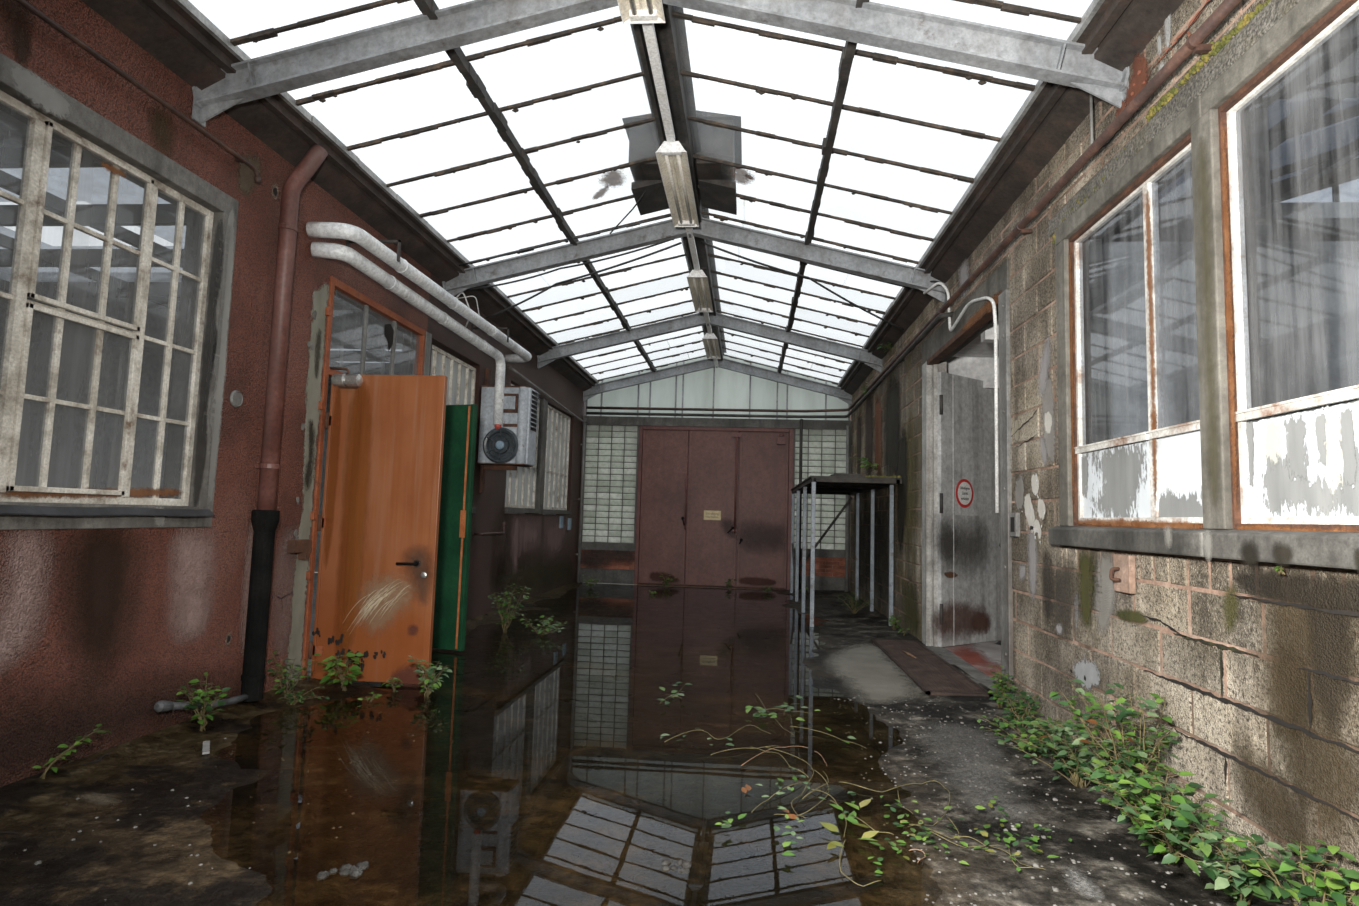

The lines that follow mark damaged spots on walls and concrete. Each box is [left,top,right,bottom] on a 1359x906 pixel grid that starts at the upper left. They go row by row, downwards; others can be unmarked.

water stain [1157,15,1171,70]
peeling [1022,474,1046,543]
peeling [1044,411,1052,434]
peeling [1081,430,1203,518]
peeling [1245,401,1359,517]
water stain [0,530,46,662]
water stain [172,535,212,634]
water stain [1095,555,1146,629]
water stain [1238,544,1359,875]
water stain [1069,871,1101,898]